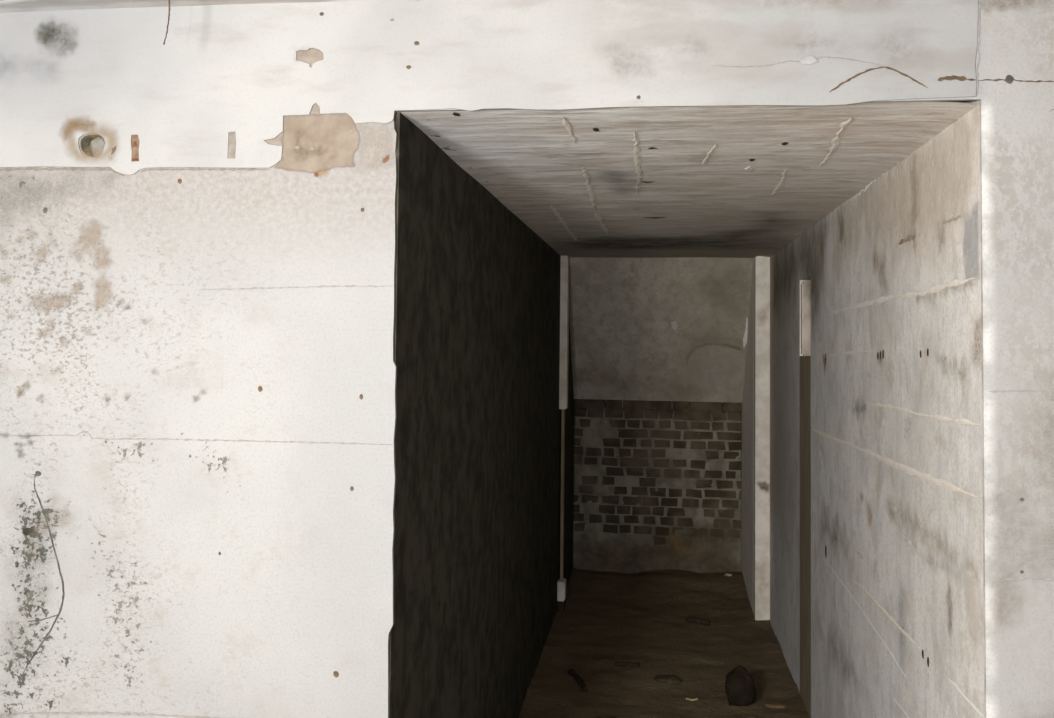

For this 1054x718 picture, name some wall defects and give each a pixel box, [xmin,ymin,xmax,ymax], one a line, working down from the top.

peeling [140,104,389,184]
peeling [297,49,323,67]
damp [0,490,72,714]
crack [23,473,64,673]